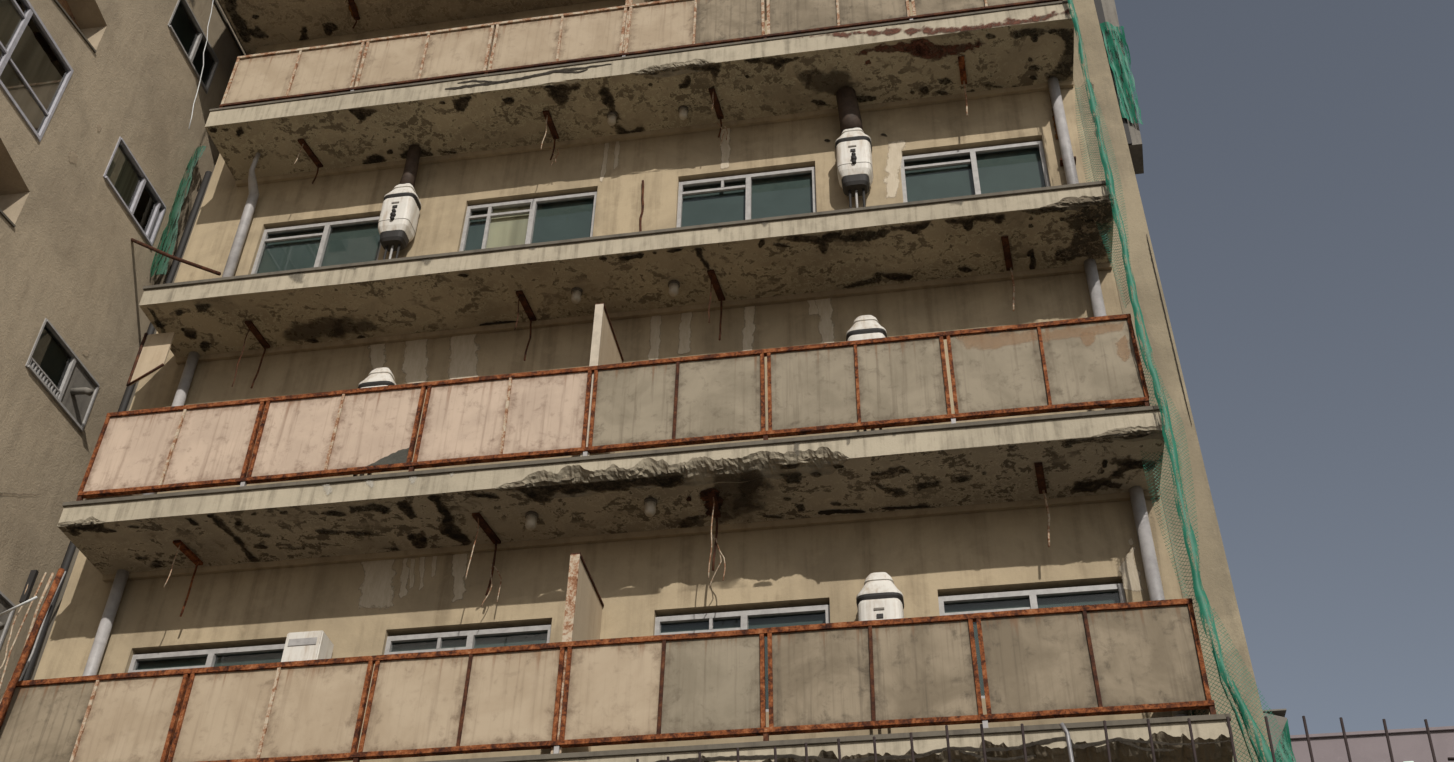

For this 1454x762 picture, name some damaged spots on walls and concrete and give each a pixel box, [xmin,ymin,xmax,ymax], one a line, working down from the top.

rust [832,9,1070,64]
peeling [967,28,1074,92]
spalling [540,83,580,105]
spalling [599,86,644,134]
peeling [911,78,952,95]
spalling [470,446,850,528]
peeling [871,466,986,497]
spalling [1060,425,1164,494]
spalling [185,513,305,562]
spalling [315,495,471,551]
spalling [762,731,1233,762]